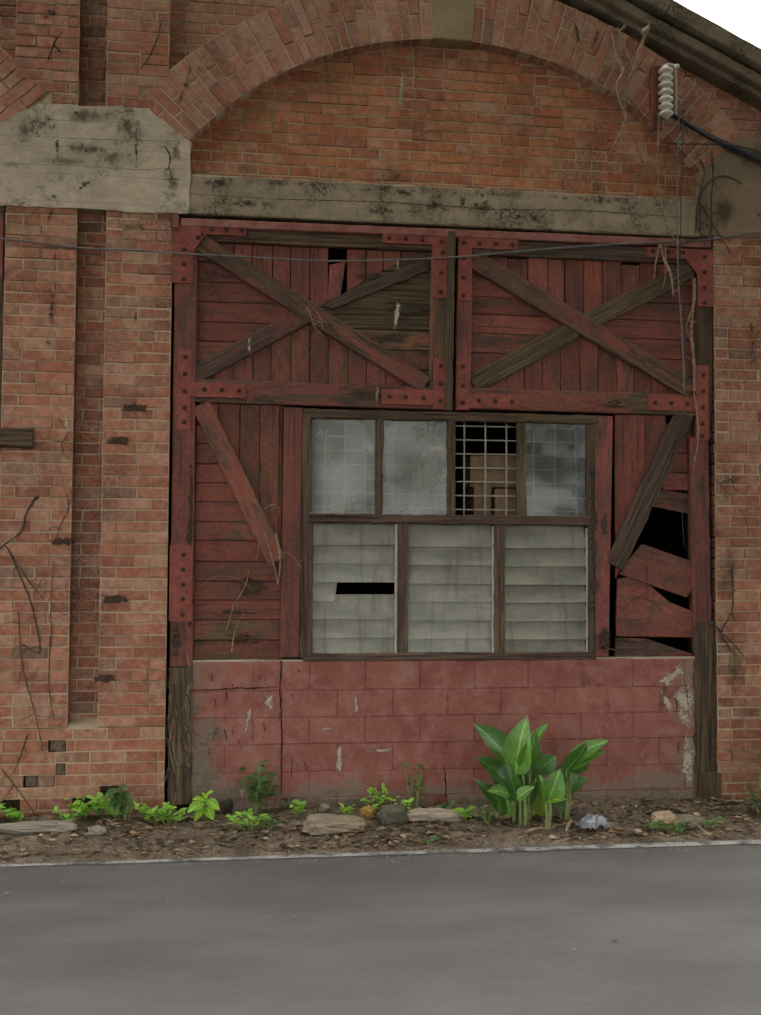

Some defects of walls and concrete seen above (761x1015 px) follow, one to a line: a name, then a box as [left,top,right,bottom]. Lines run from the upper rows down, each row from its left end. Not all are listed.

damp [367,174,519,216]
peeling [658,665,695,793]